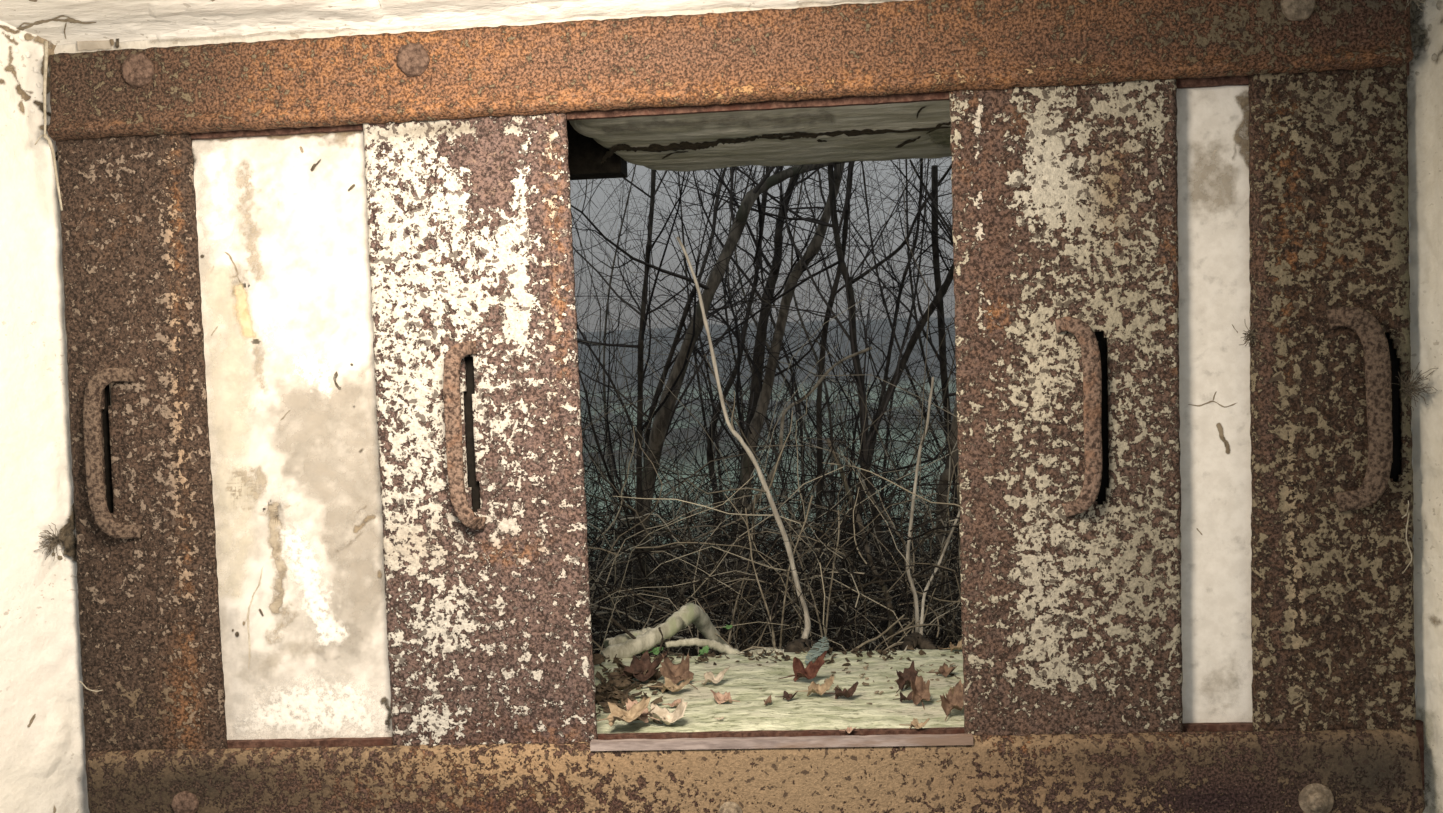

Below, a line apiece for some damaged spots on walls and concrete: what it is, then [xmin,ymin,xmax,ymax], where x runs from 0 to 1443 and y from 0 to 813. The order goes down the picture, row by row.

water stain [198,147,262,279]
water stain [207,269,382,646]
water stain [235,676,390,740]